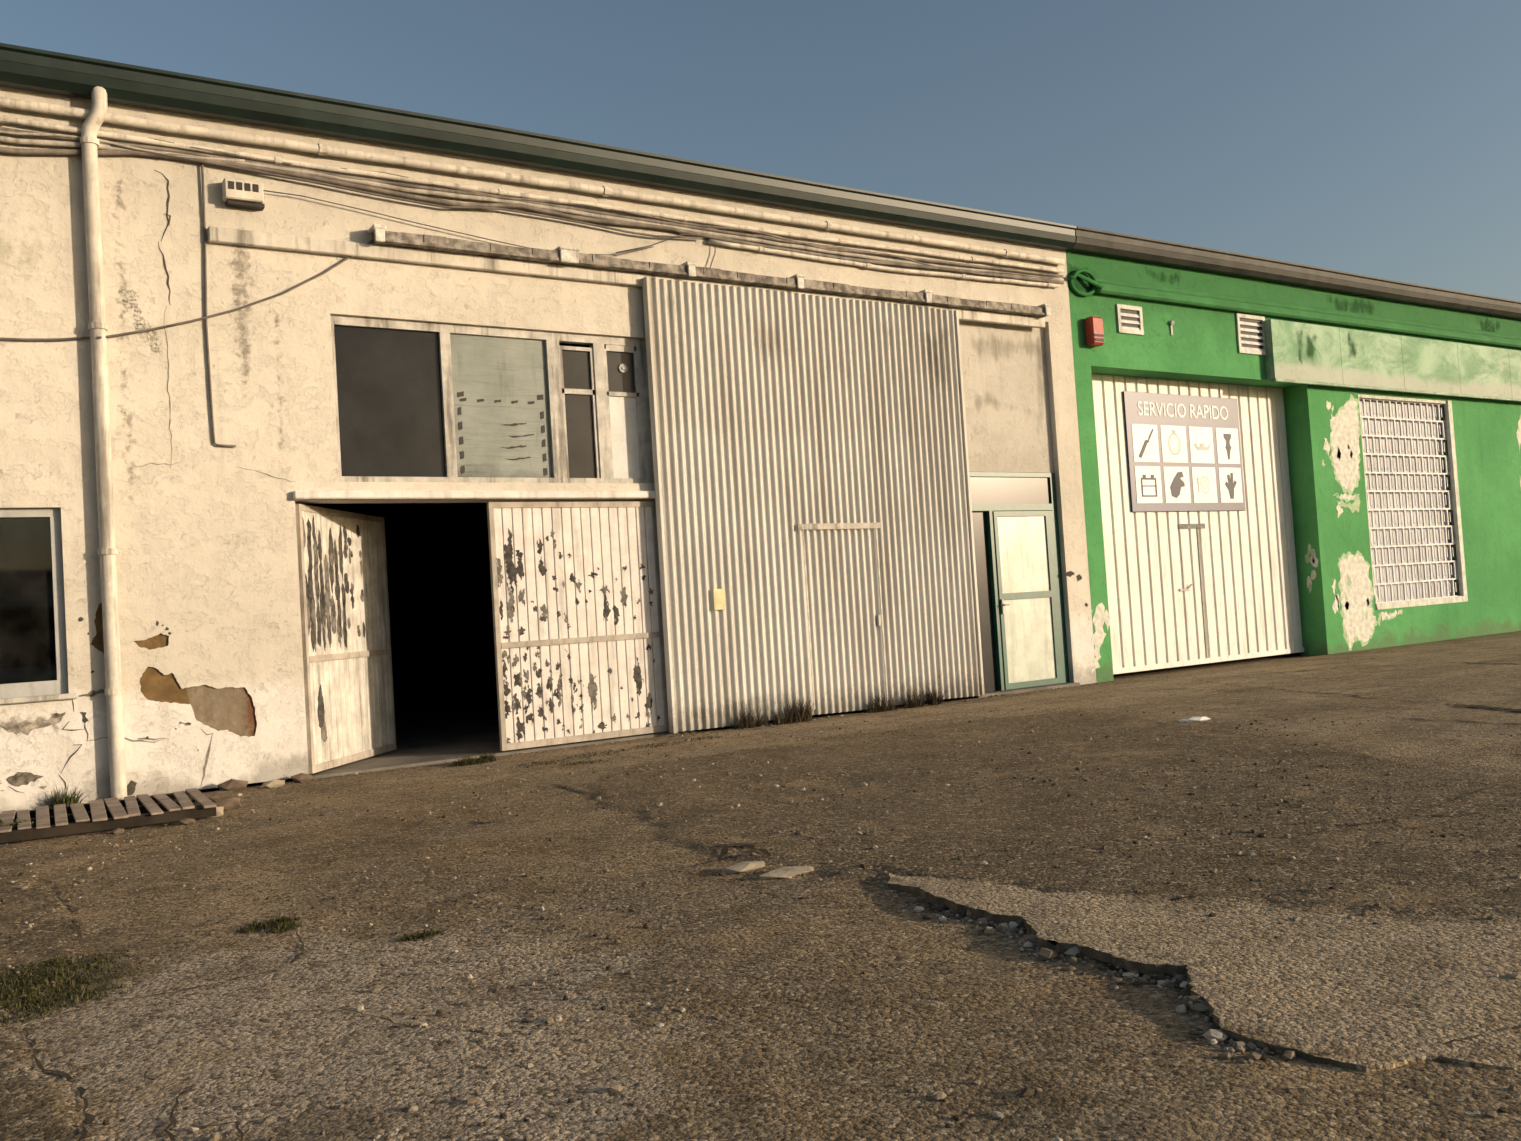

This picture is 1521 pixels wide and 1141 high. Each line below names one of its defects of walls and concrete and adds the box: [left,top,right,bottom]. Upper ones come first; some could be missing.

crack [144,170,179,468]
peeling [1322,394,1361,518]
flaking render [0,670,105,735]
flaking render [78,603,104,654]
flaking render [134,621,257,737]
peeling [317,685,327,742]
peeling [302,515,366,652]
peeling [496,529,660,743]
peeling [1305,544,1403,651]
crack [918,901,1239,1041]
crack [1456,1025,1521,1042]